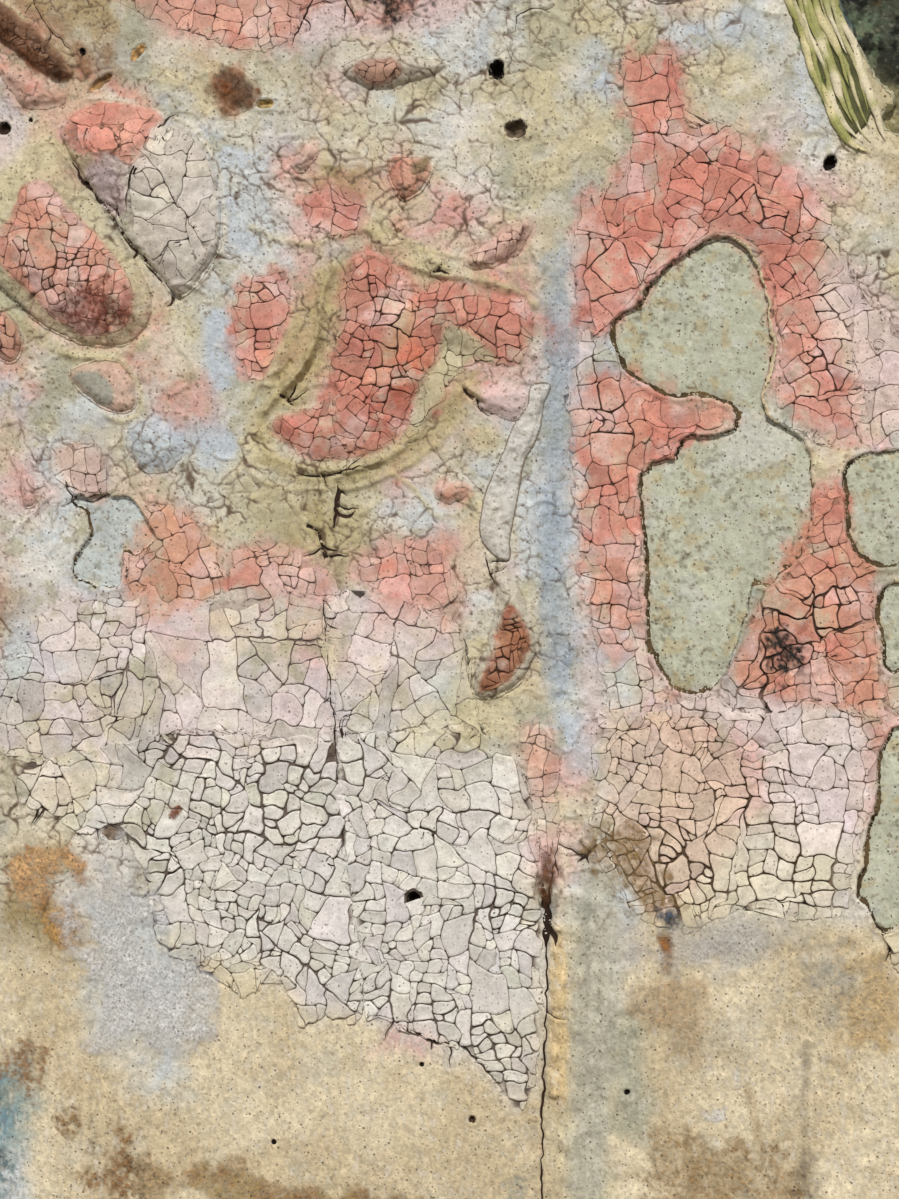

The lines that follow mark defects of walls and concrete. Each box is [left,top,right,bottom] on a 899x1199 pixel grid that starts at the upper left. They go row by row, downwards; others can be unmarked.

rust [213,67,260,112]
crack [120,0,358,53]
peeling [72,494,155,588]
crack [272,255,533,528]
peeling [609,237,814,694]
crack [552,46,899,935]
peeling [842,450,899,674]
rust [9,845,86,950]
crack [0,504,560,1199]
rust [536,850,561,901]
peeling [856,727,899,932]
water stain [186,1162,369,1199]